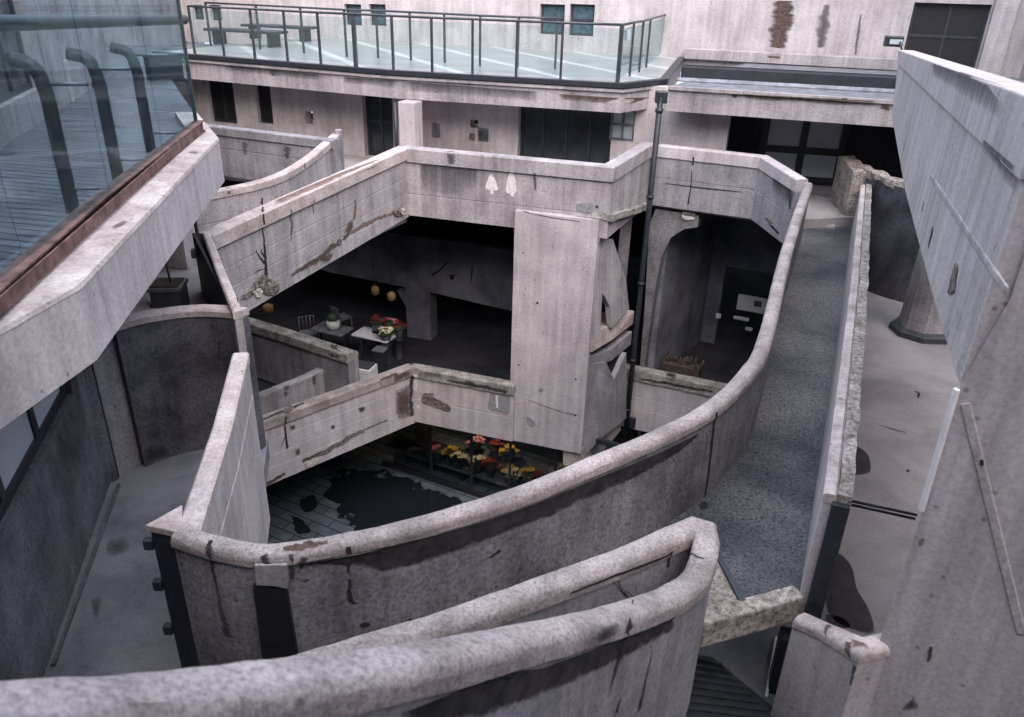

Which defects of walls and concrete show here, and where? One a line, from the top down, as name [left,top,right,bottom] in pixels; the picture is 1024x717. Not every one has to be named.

water stain [818,5,829,48]
crack [665,157,741,204]
crack [255,198,268,277]
spalling [421,393,450,411]
crack [281,412,289,449]
spalling [302,420,388,468]
water stain [205,540,232,638]